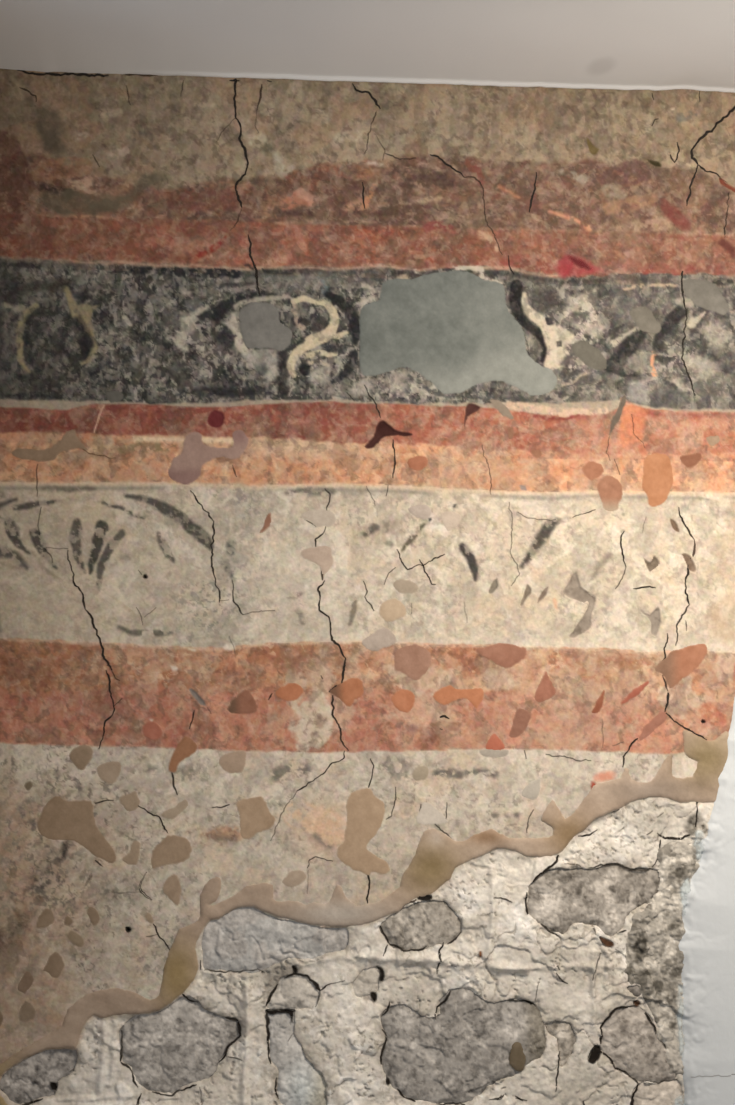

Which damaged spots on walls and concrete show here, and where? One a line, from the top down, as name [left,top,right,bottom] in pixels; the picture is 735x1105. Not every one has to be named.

crack [229,79,272,208]
crack [670,106,735,235]
crack [248,234,260,296]
crack [681,271,695,396]
crack [67,551,120,749]
crack [274,489,449,836]
crack [615,531,656,589]
crack [662,507,707,740]
flaking render [0,742,714,1077]